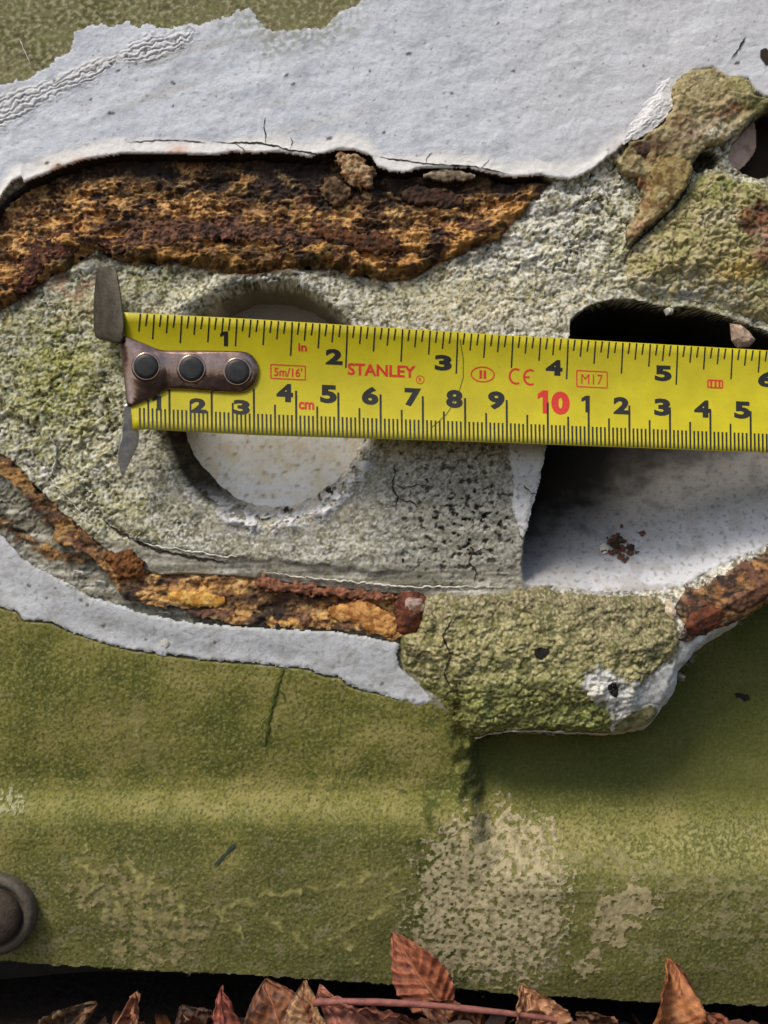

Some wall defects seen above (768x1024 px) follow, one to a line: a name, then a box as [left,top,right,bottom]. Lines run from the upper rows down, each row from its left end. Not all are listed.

peeling [760,48,768,65]
spalling [615,67,768,245]
rust [0,151,547,310]
rust [740,197,768,266]
spalling [730,323,755,349]
peeling [508,443,547,537]
rust [0,454,426,640]
peeling [257,570,507,589]
rust [664,547,768,642]
crack [261,666,285,744]
spalling [583,659,676,733]
water stain [56,791,768,993]